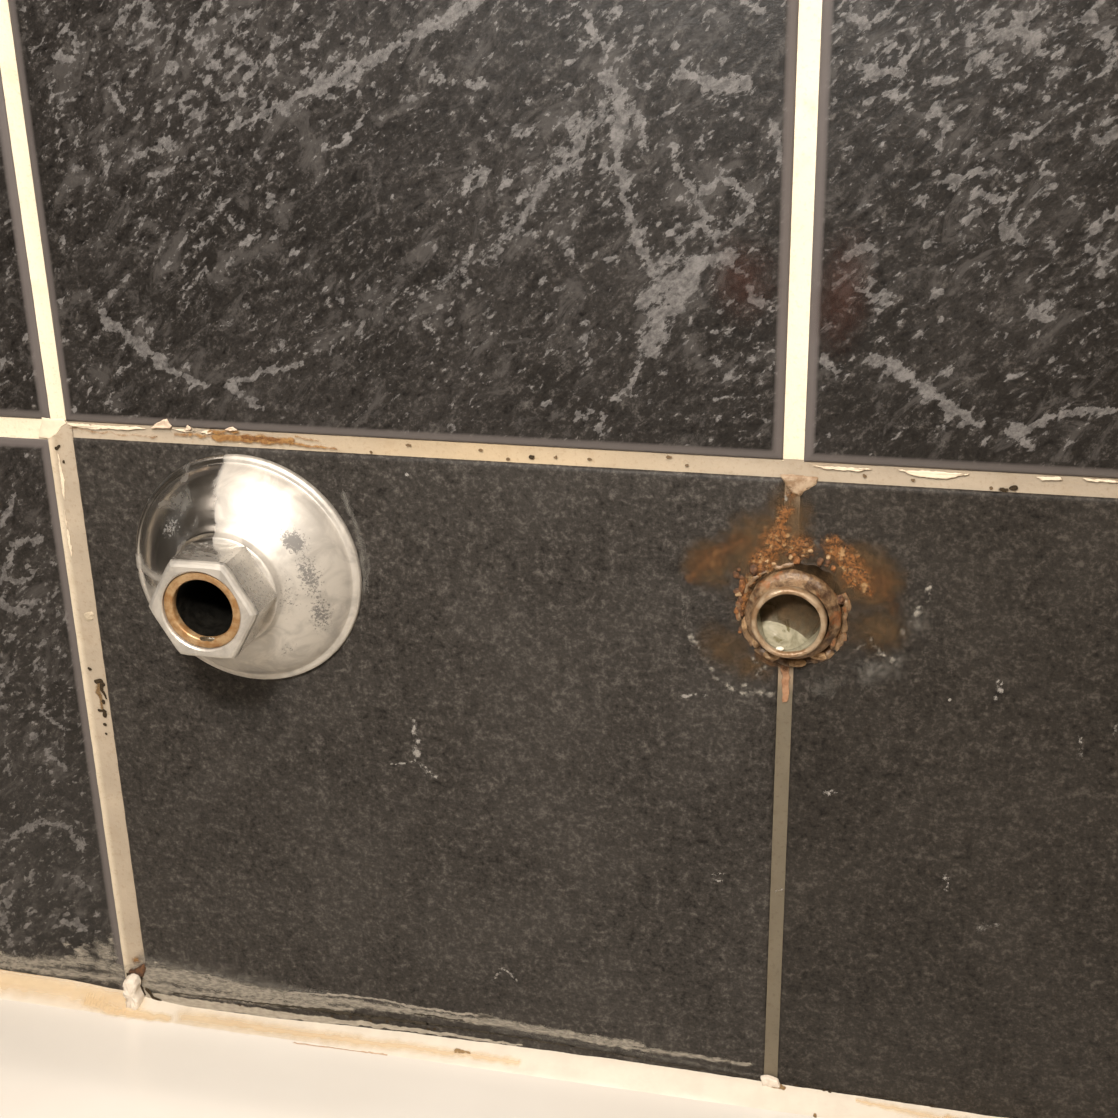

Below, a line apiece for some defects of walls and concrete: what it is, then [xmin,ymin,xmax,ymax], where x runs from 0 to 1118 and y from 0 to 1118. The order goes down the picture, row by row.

corrosion [174,430,337,450]
corrosion [687,490,900,702]